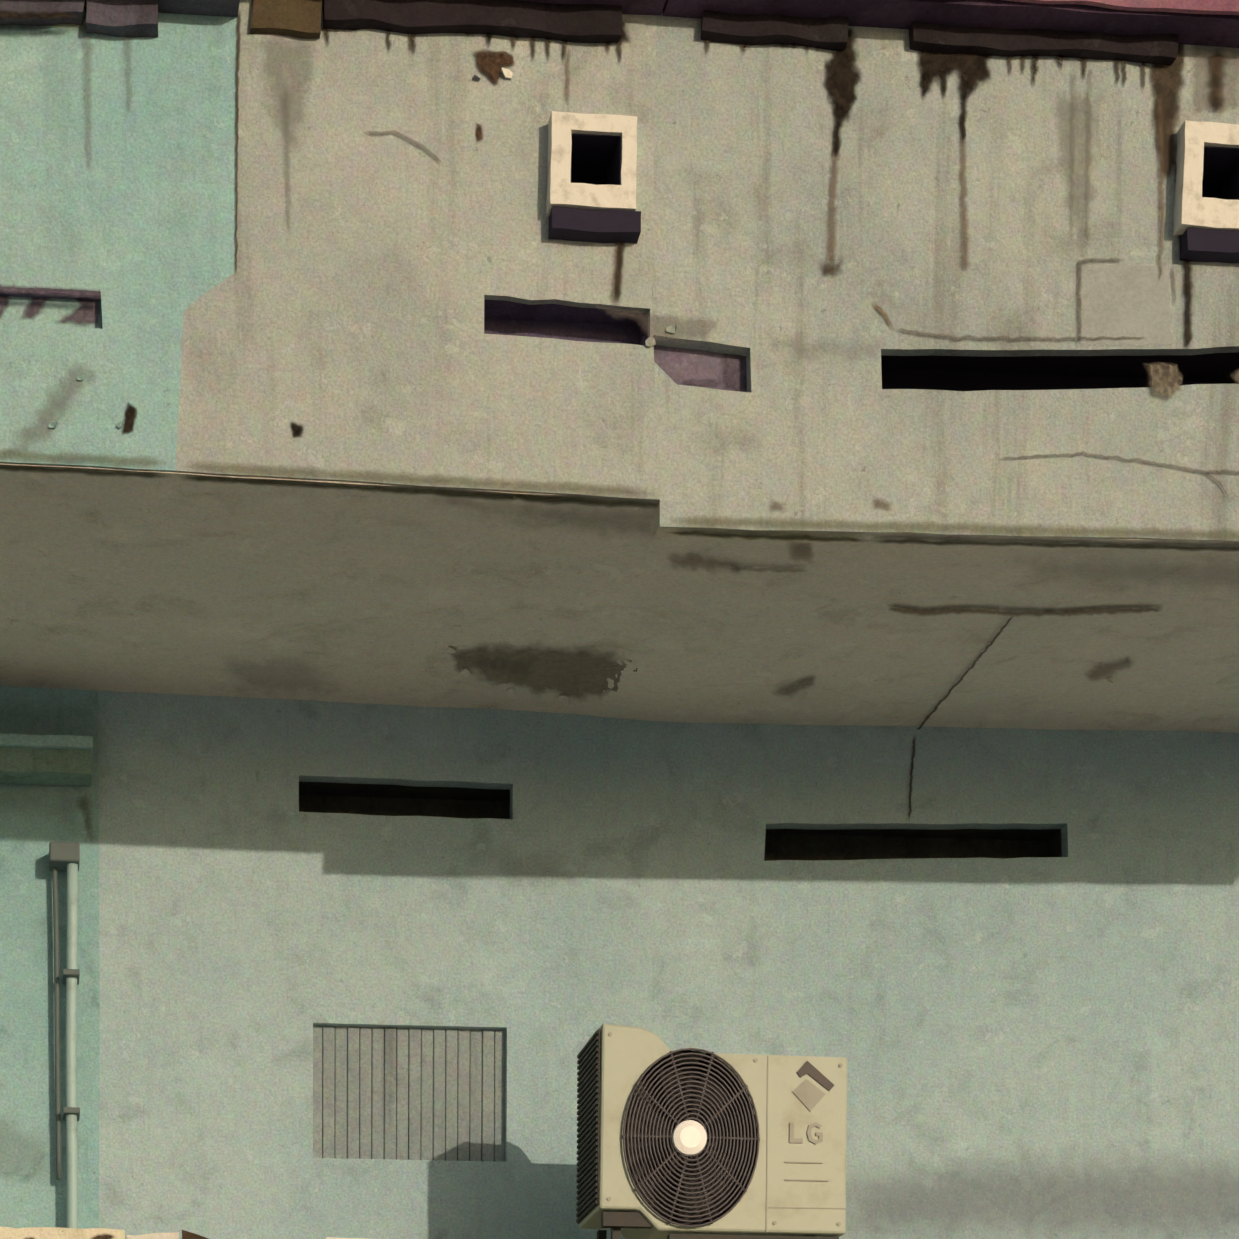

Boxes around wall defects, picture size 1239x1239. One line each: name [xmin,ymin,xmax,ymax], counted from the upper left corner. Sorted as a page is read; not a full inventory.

spalling [1148,363,1182,397]
crack [890,607,1159,818]